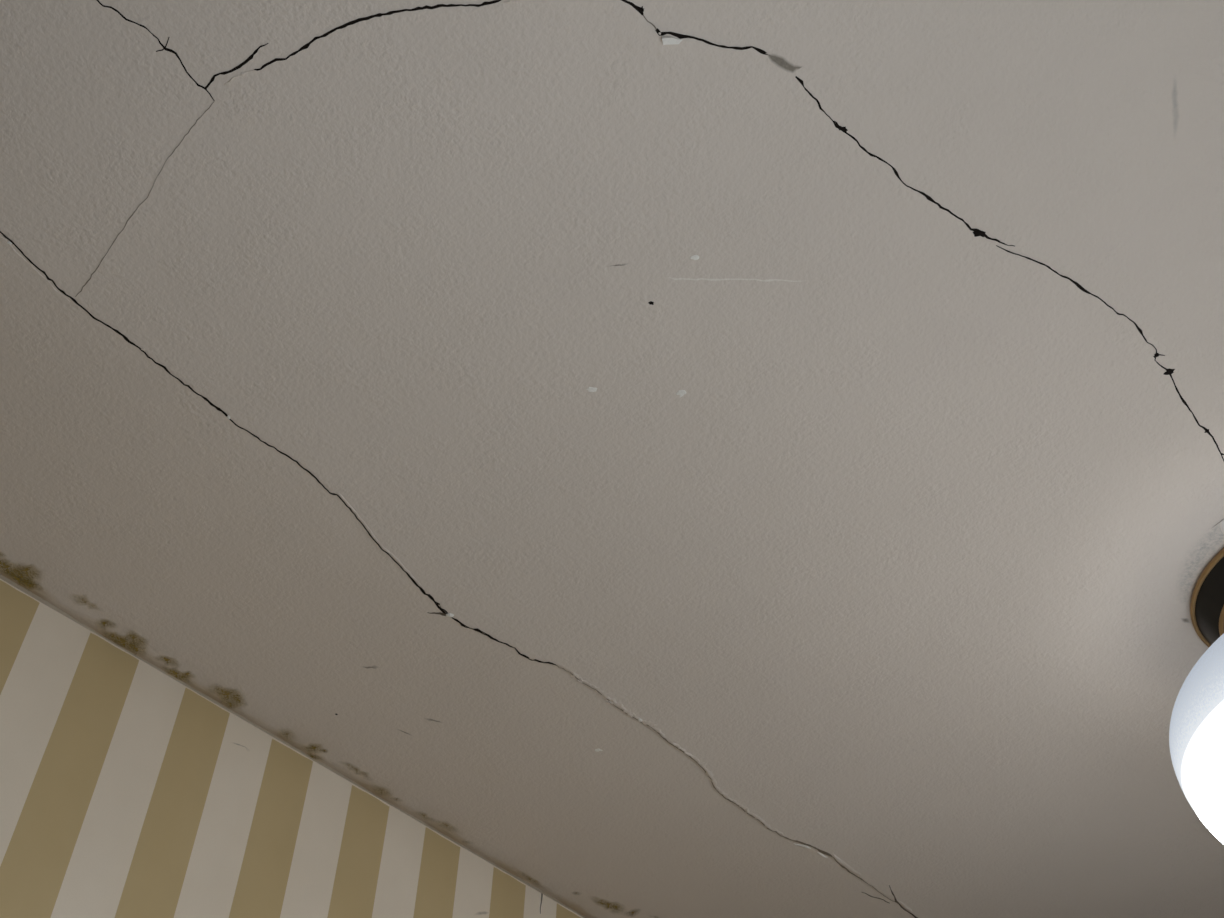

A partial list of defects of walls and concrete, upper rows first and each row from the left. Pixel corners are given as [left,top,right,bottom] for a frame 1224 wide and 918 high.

leakage [101,621,143,652]
crack [0,0,917,918]
crack [795,76,1224,461]